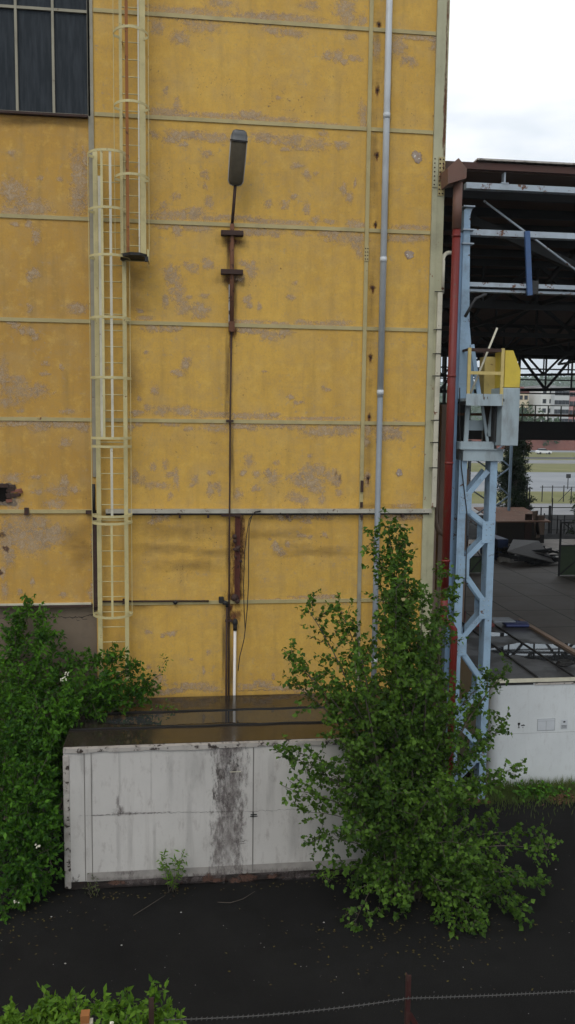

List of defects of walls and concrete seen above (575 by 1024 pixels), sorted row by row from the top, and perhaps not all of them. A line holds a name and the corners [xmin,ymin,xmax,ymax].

peeling [0,474,78,594]
corrosion [221,513,244,620]
peeling [270,455,341,564]
leakage [213,747,240,855]